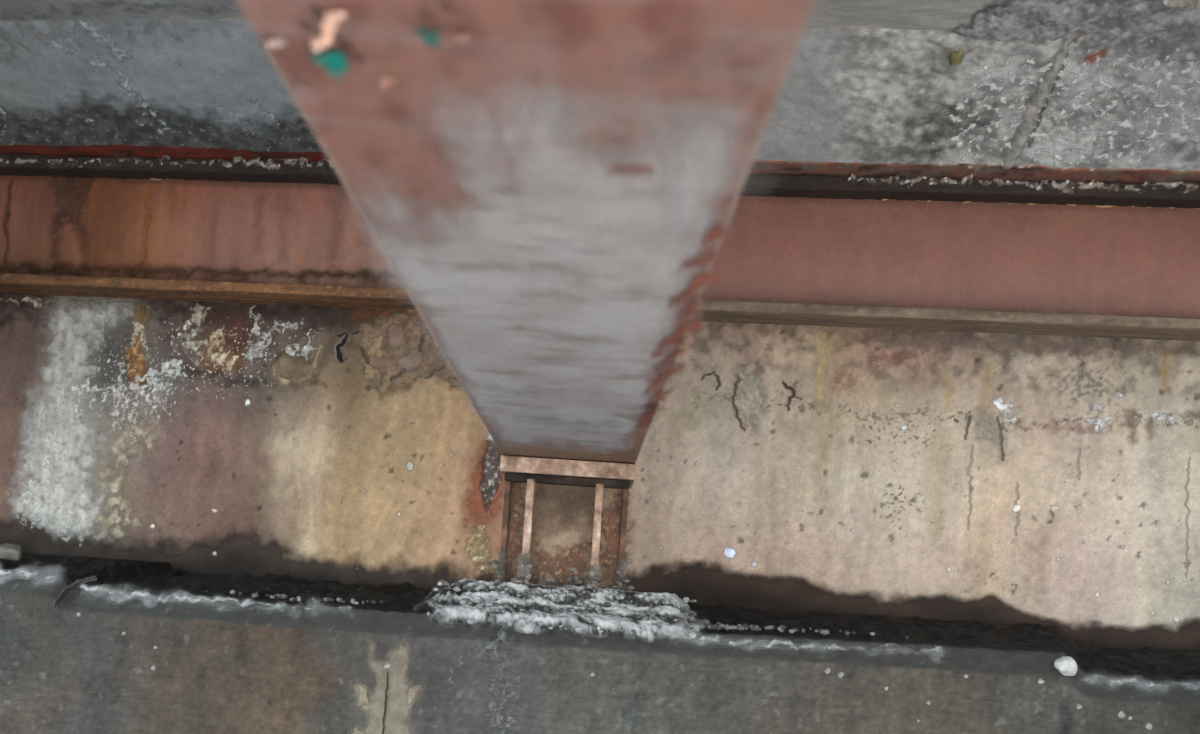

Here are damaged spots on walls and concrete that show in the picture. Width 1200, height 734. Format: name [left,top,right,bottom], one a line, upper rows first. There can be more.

water stain [0,2,197,134]
peeling [267,40,289,50]
peeling [302,8,364,81]
spalling [953,0,1200,44]
peeling [357,94,738,452]
corrosion [125,302,150,385]
crack [701,371,721,391]
crack [782,381,802,411]
corrosion [466,432,634,586]
water stain [0,294,1200,734]
crack [381,672,389,734]
peeling [352,642,422,734]